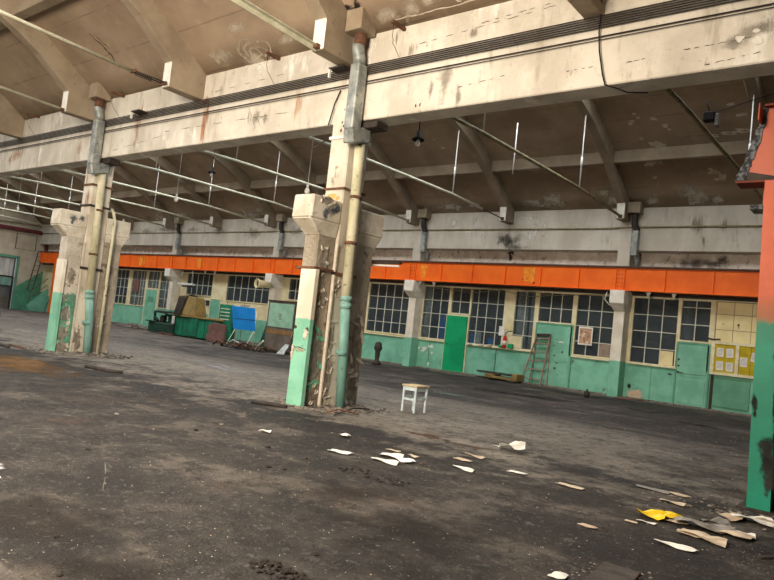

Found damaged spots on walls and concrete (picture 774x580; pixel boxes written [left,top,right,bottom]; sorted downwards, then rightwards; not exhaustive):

spalling [735,28,763,45]
spalling [66,267,77,287]
spalling [55,295,84,353]
spalling [303,320,337,405]